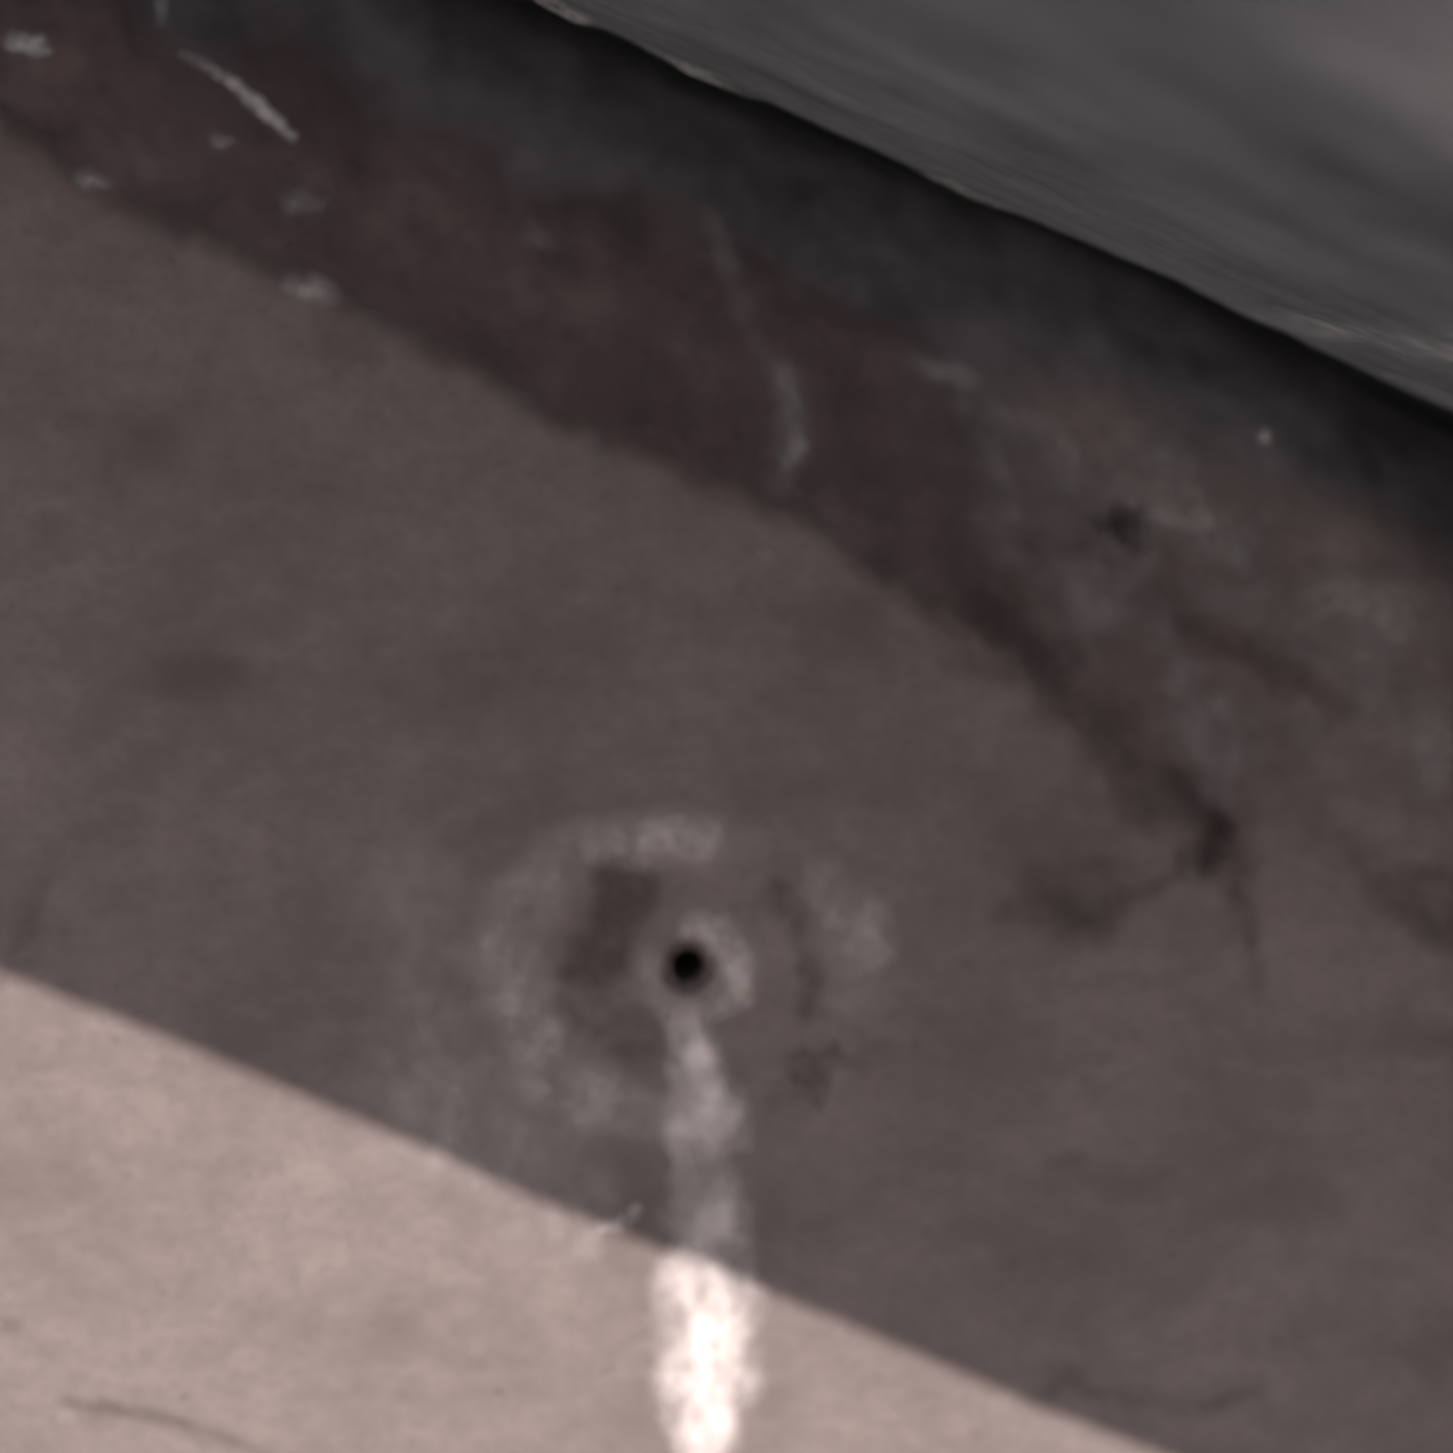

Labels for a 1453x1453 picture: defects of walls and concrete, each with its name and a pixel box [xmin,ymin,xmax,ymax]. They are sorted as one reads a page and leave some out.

leakage [666,911,756,1154]
leakage [660,1198,750,1453]